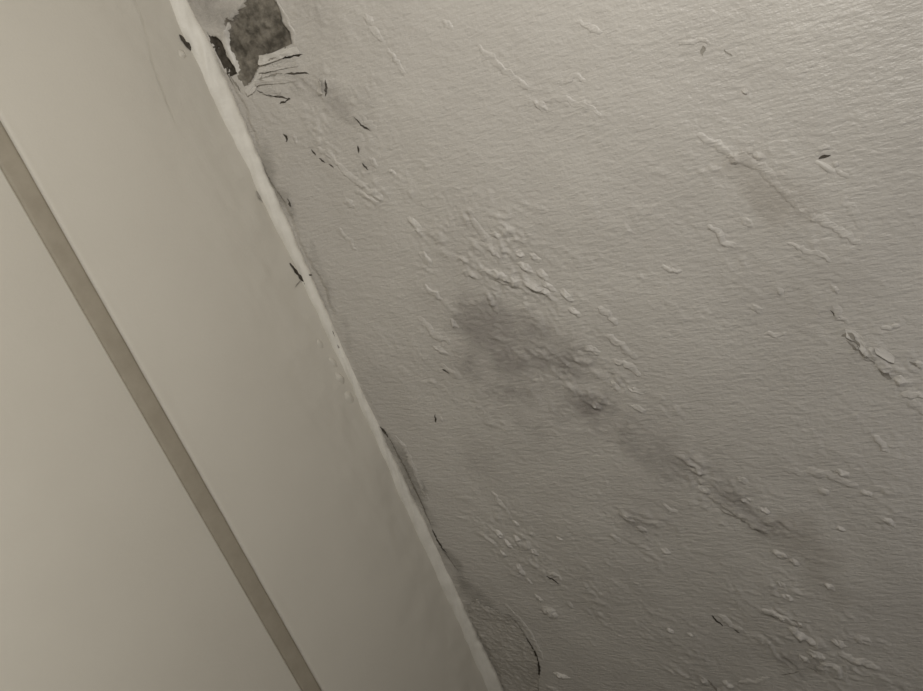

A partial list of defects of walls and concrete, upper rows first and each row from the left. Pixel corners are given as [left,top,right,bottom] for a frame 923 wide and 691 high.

flaking render [208,0,328,104]
peeling [466,599,570,691]